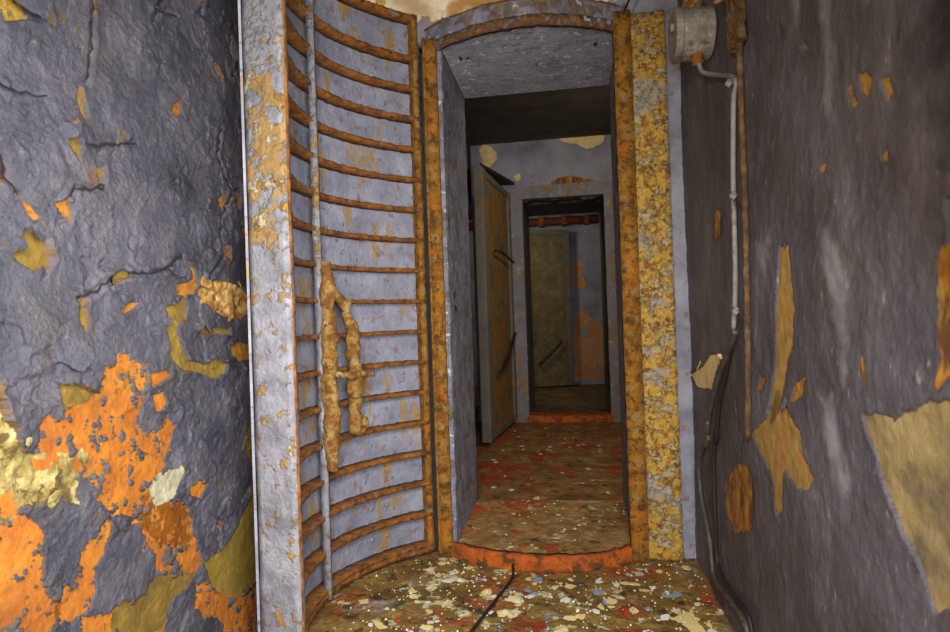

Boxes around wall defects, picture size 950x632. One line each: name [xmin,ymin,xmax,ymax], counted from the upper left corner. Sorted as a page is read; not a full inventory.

peeling [230,35,240,62]
rust [435,13,613,51]
peeling [58,94,85,155]
rust [541,176,597,186]
spalling [10,193,49,281]
peeling [54,200,71,224]
peeling [112,262,134,286]
peeling [752,242,814,515]
peeling [0,267,258,632]
peeling [866,400,950,614]